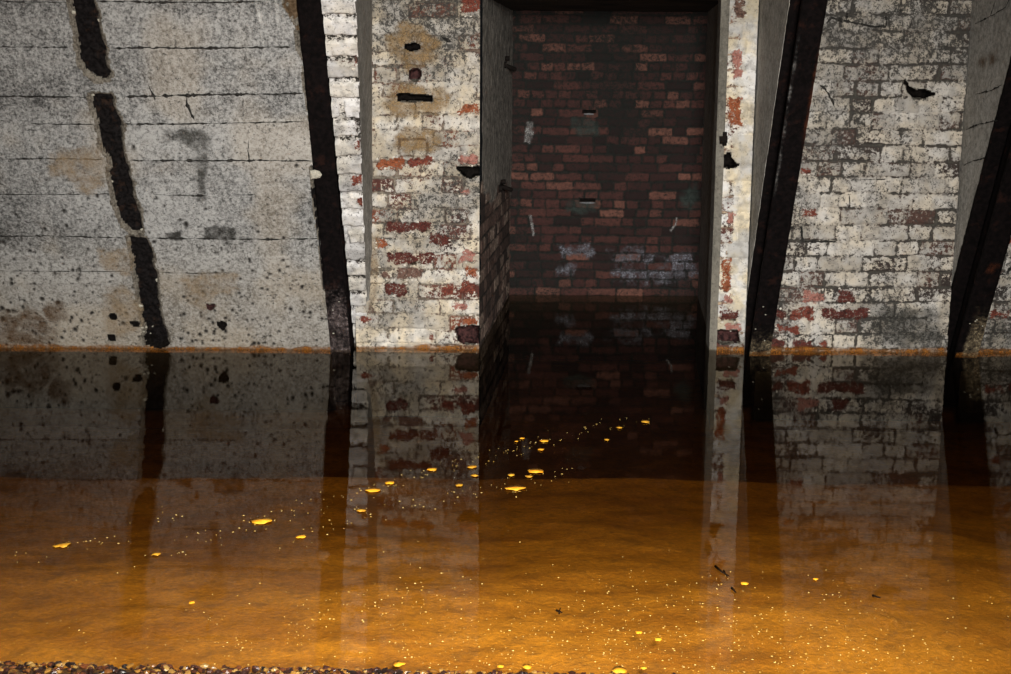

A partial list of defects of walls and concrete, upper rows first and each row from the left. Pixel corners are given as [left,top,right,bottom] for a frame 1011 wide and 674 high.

crack [97,0,261,8]
spalling [903,79,935,100]
peeling [457,103,480,116]
peeling [376,155,435,171]
crack [0,190,109,198]
crack [156,191,205,199]
crack [0,232,121,240]
crack [148,235,317,243]
peeling [375,220,451,297]
crack [33,267,124,275]
spalling [439,249,480,345]
peeling [763,287,870,354]